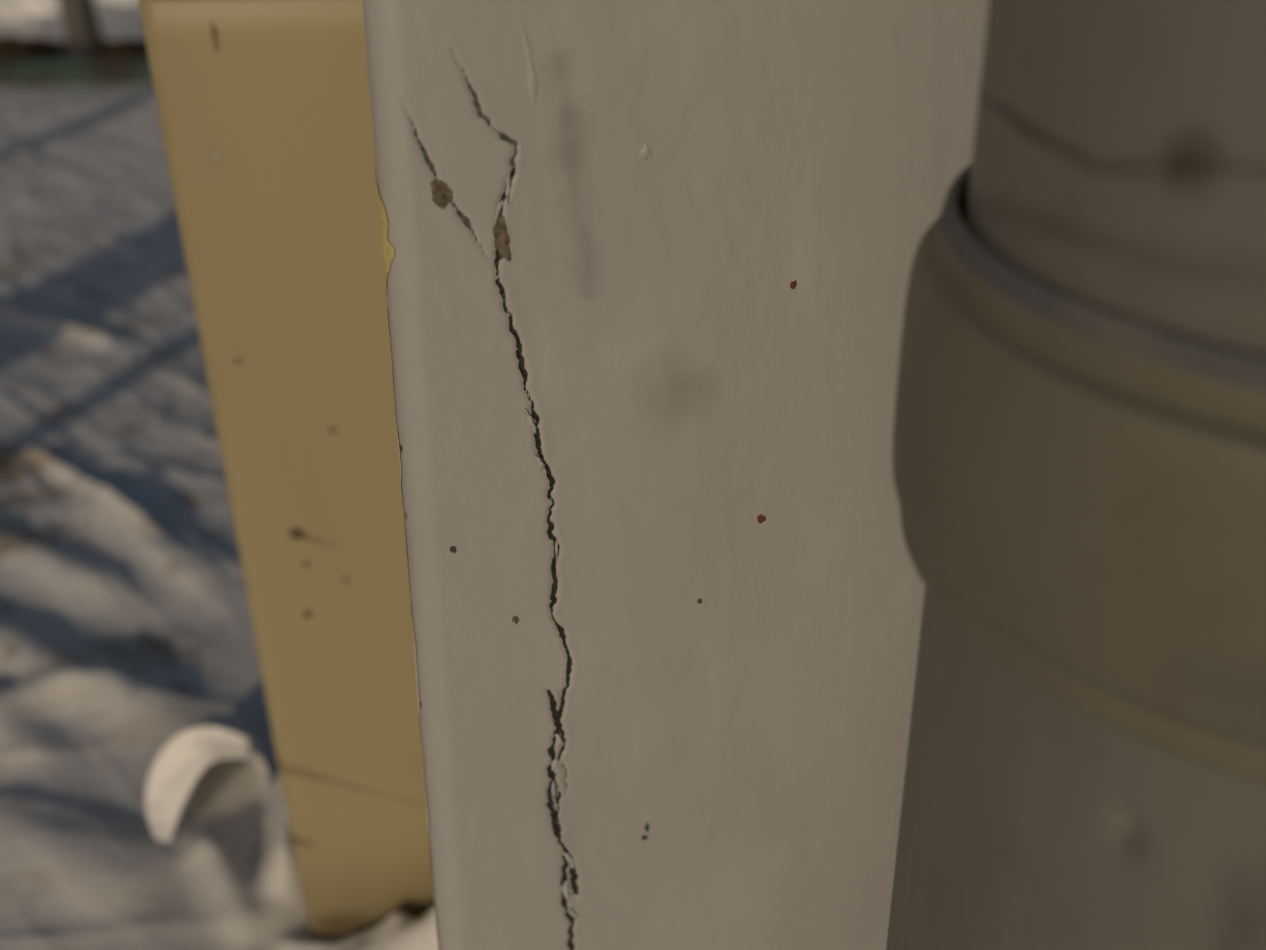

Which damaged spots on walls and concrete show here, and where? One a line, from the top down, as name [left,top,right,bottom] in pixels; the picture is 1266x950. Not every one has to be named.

crack [403,53,579,950]